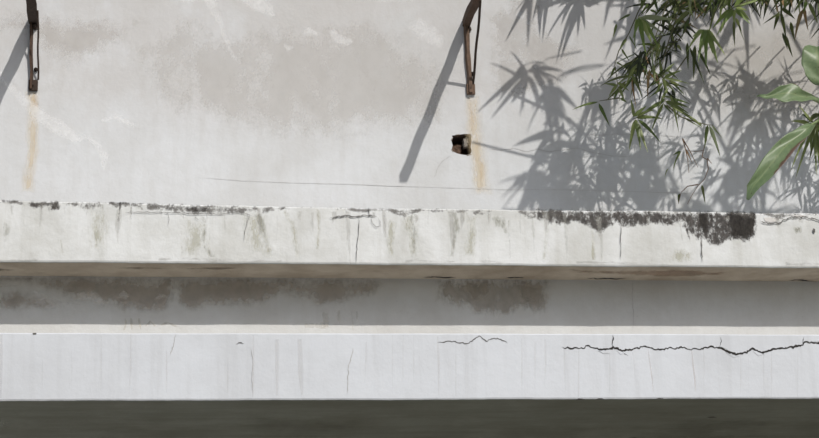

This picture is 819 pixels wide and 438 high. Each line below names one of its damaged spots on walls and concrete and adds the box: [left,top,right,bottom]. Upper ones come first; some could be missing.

hole [451,134,472,156]
corrosion [471,123,485,190]
leakage [2,200,285,232]
leakage [349,208,439,253]
leakage [519,208,798,249]
leakage [42,279,377,310]
leakage [443,281,546,313]
crack [588,278,634,325]
crack [437,336,506,344]
crack [563,337,819,358]